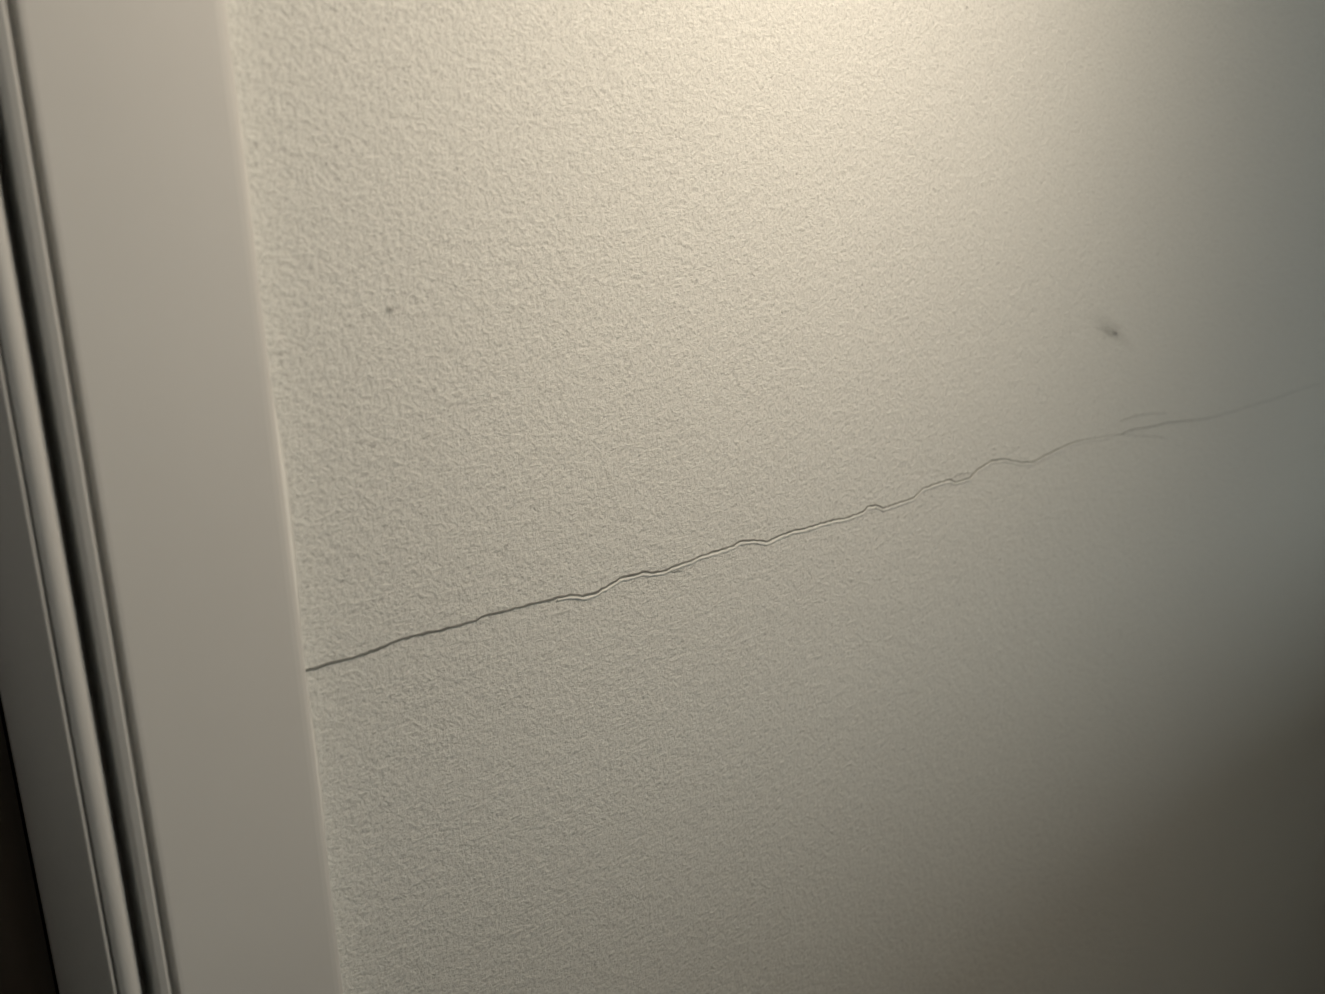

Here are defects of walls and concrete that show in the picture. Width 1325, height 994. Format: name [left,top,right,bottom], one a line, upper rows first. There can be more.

crack [306,385,1315,672]